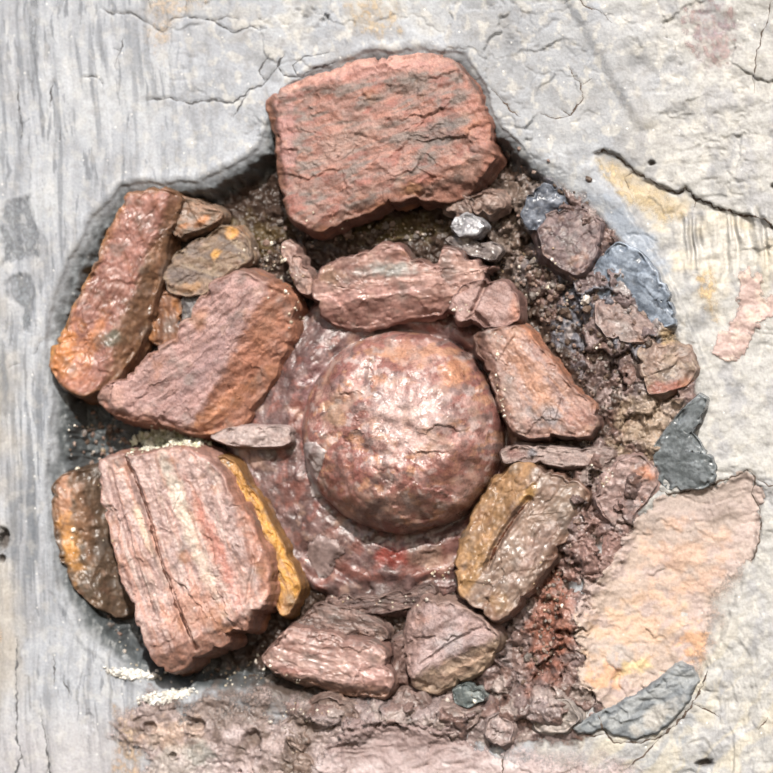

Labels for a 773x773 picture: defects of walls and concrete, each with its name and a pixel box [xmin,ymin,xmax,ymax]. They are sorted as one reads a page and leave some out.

crack [102,0,267,41]
crack [150,52,336,118]
water stain [1,196,39,262]
peeling [442,182,606,283]
crack [595,148,773,229]
water stain [6,275,32,327]
peeling [592,299,700,401]
spalling [532,392,765,740]
spalling [110,630,631,773]